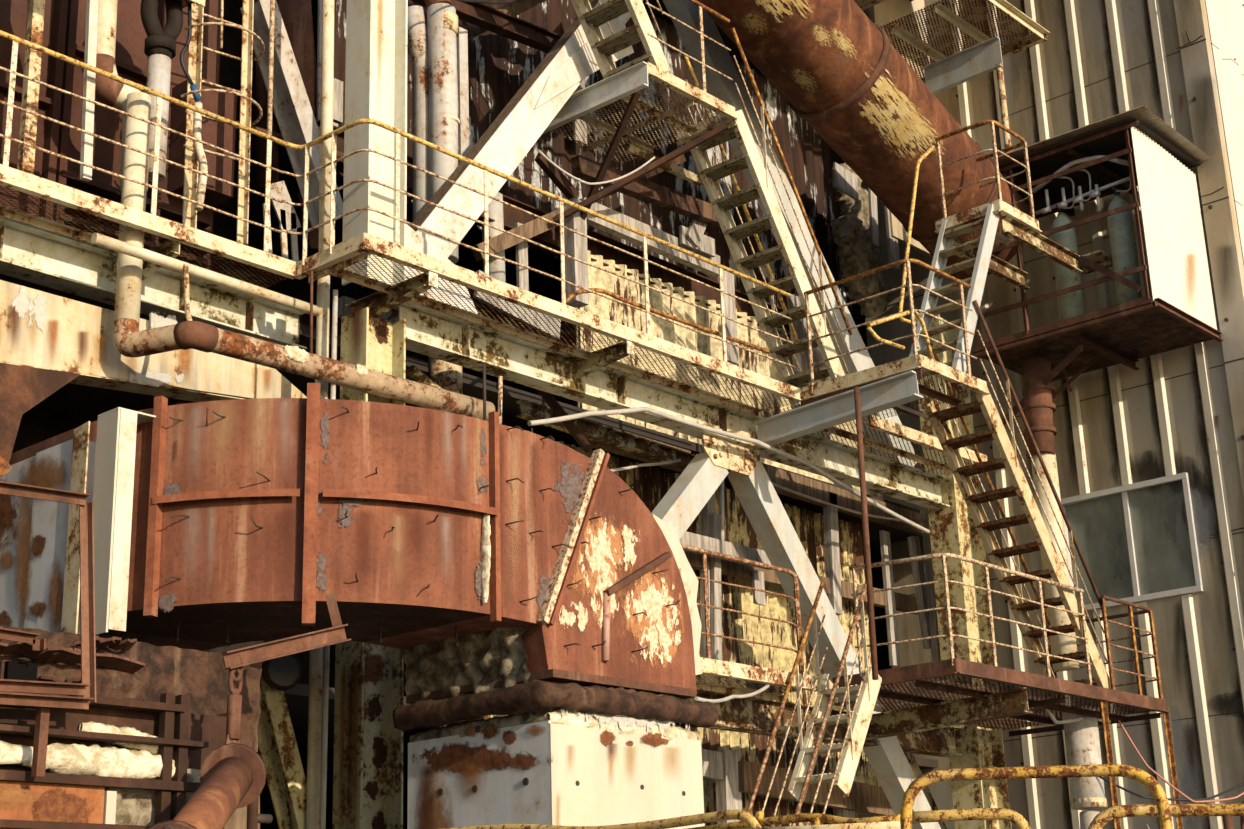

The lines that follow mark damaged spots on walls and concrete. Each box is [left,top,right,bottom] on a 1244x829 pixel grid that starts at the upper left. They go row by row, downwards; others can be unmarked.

peeling [742,0,858,61]
peeling [859,66,945,161]
peeling [11,286,47,333]
rust [80,332,105,354]
leakage [1061,378,1076,469]
rust [338,497,372,529]
leakage [1102,344,1234,644]
rust [0,459,145,683]
peeling [559,514,684,668]
rust [0,786,93,823]
rust [413,723,552,829]
rust [600,730,674,770]